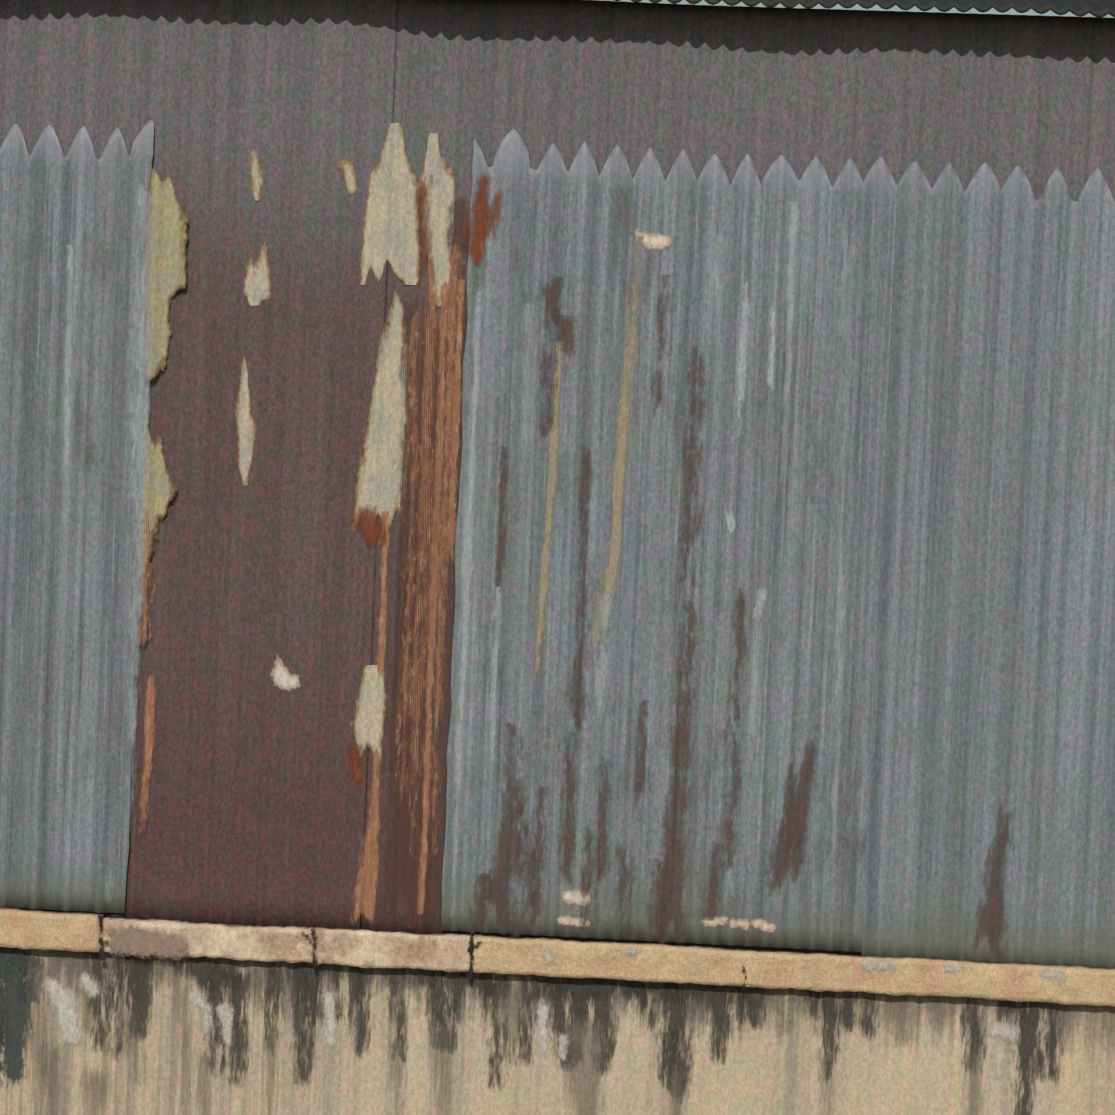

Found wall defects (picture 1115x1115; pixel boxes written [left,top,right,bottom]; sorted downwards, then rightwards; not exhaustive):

peeling [144,167,188,381]
peeling [233,355,257,486]
peeling [338,123,457,534]
corrosion [347,176,500,921]
corrosion [535,279,574,672]
corrosion [574,235,642,727]
peeling [350,665,388,764]
corrosion [649,602,695,943]
damp [0,947,154,1083]
damp [264,962,372,1085]
damp [385,968,766,1104]
damp [960,999,1066,1115]